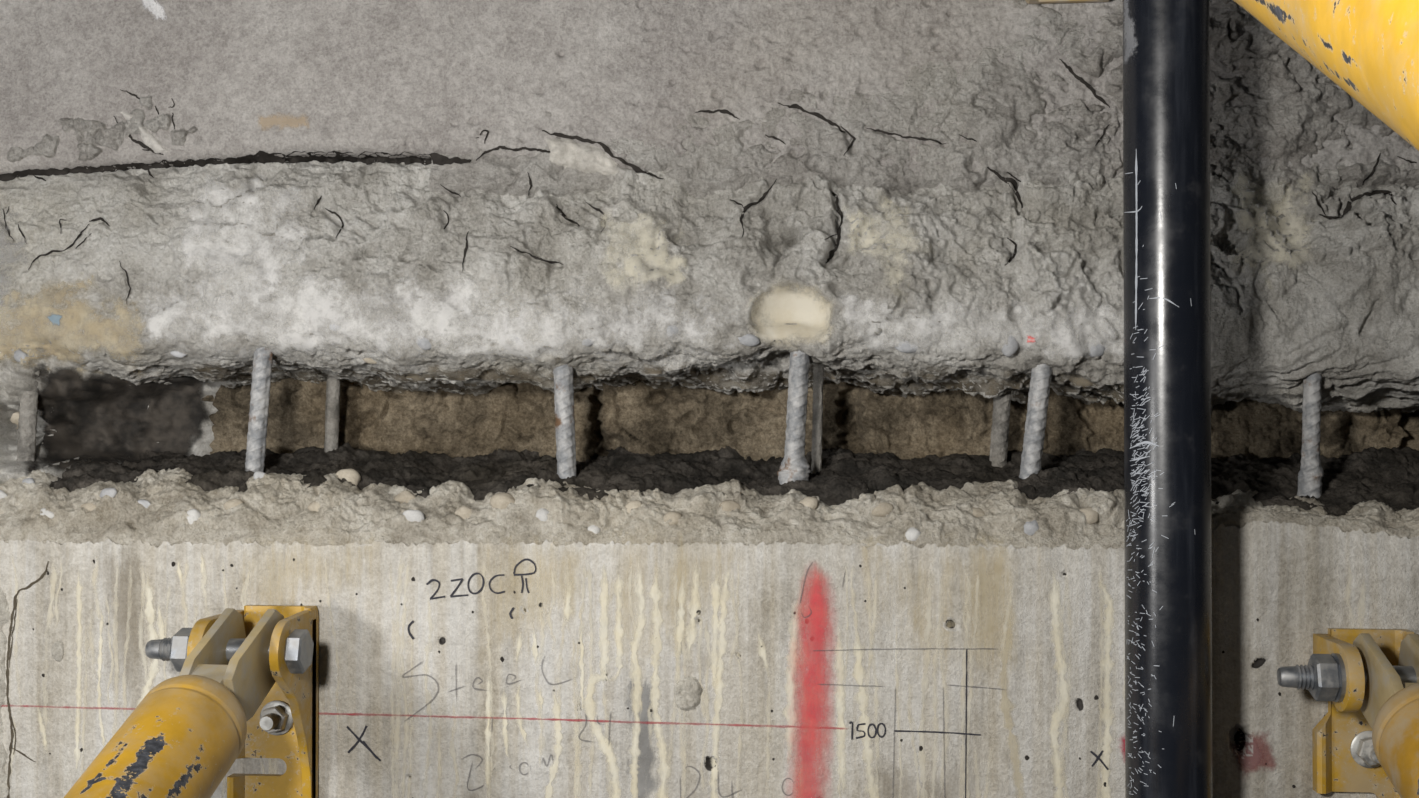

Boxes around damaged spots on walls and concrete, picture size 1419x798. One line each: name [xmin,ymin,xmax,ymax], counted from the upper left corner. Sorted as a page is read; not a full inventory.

crack [0,90,664,271]
crack [695,103,1023,265]
crack [1059,59,1110,146]
crack [1312,153,1417,220]
spalling [0,348,1124,550]
spalling [1211,489,1419,539]
crack [6,562,48,798]
leakage [48,558,207,768]
leakage [485,569,740,798]
leakage [767,614,802,784]
leakage [835,574,880,798]
leakage [1050,580,1070,798]